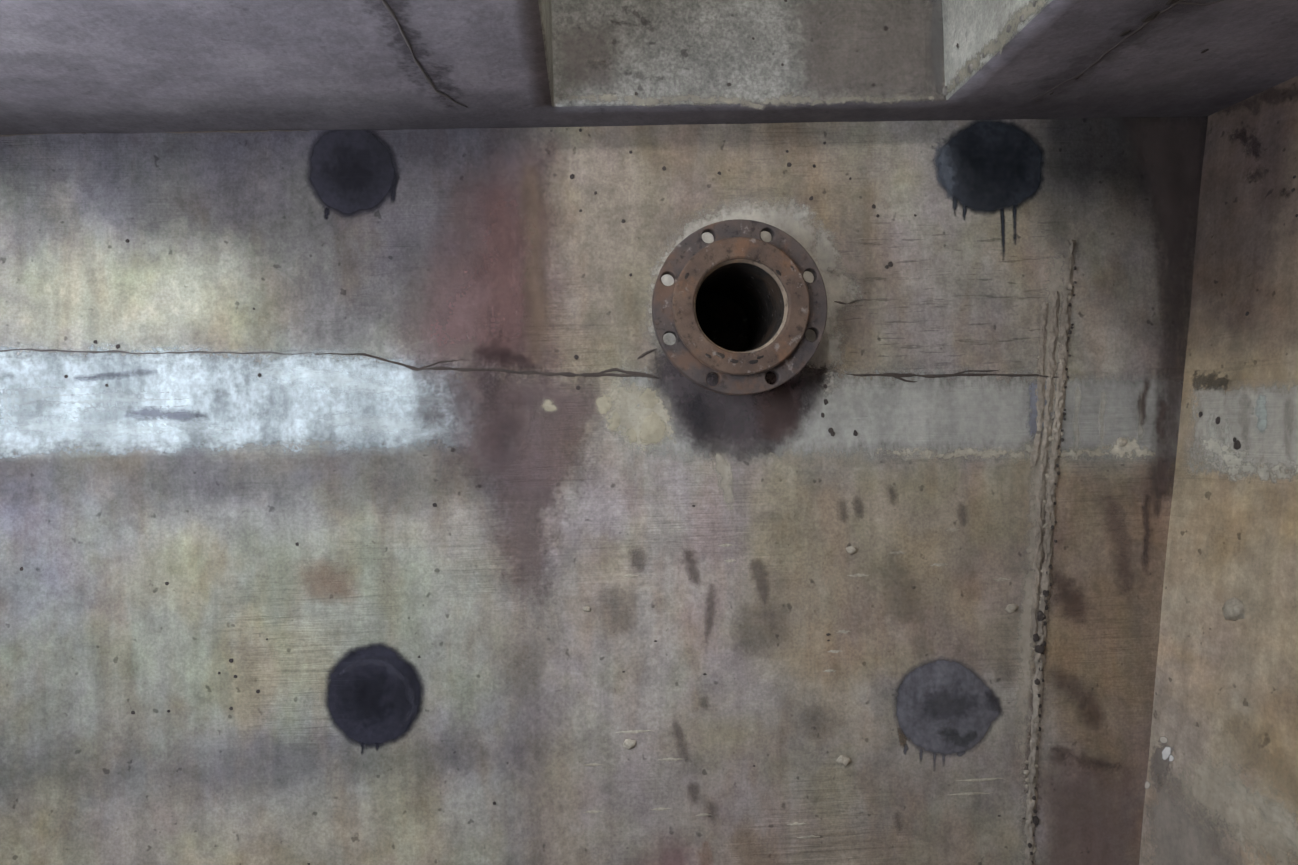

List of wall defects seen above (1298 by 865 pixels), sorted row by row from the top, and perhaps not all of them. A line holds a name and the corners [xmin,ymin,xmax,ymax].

crack [377,0,468,108]
crack [0,349,659,379]
crack [846,370,1059,382]
water stain [619,118,1298,565]